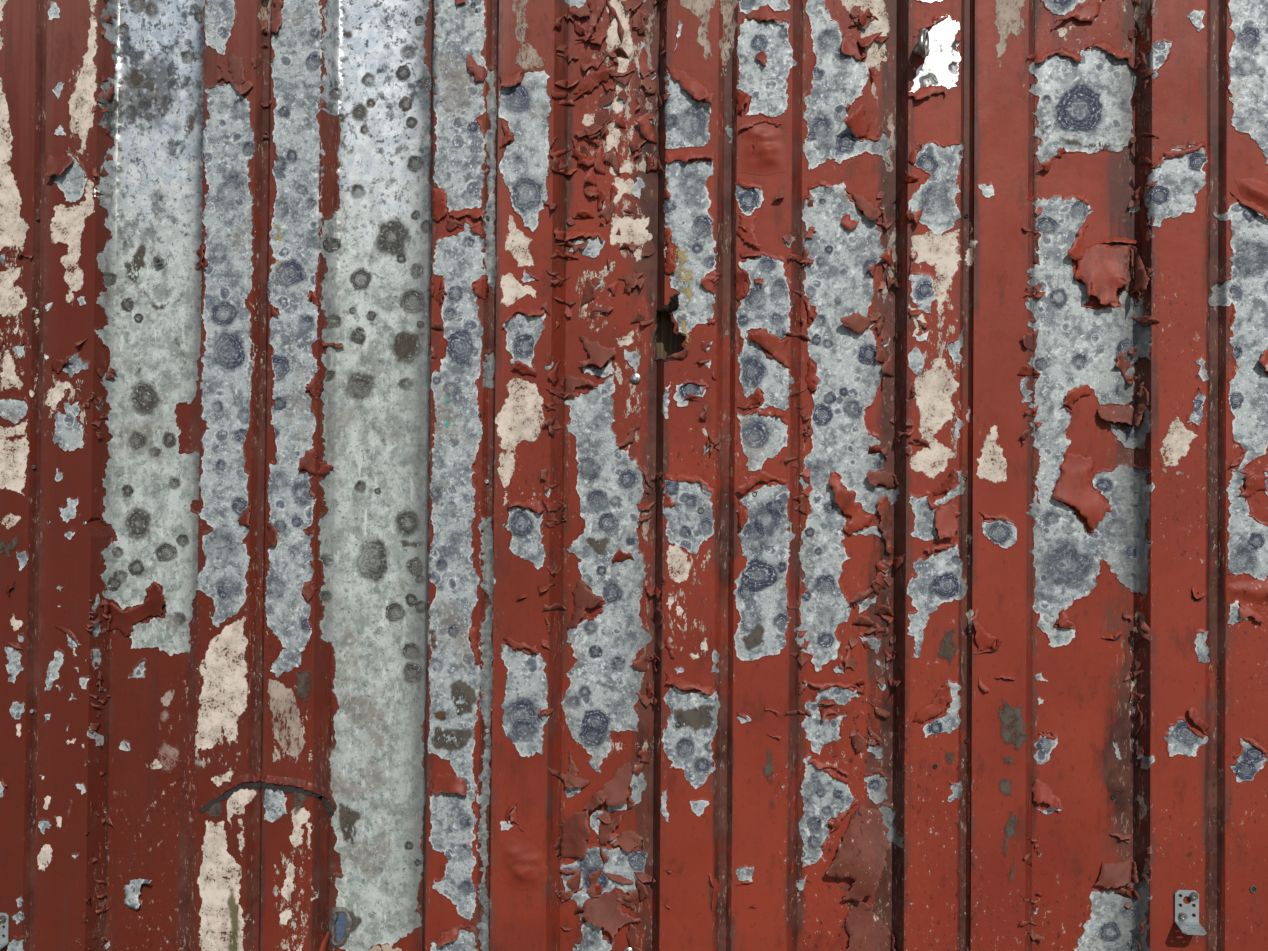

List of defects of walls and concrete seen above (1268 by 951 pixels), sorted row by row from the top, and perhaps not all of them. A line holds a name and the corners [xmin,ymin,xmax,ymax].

peeling [0,0,725,951]
peeling [680,0,1211,951]
peeling [1226,599,1264,627]